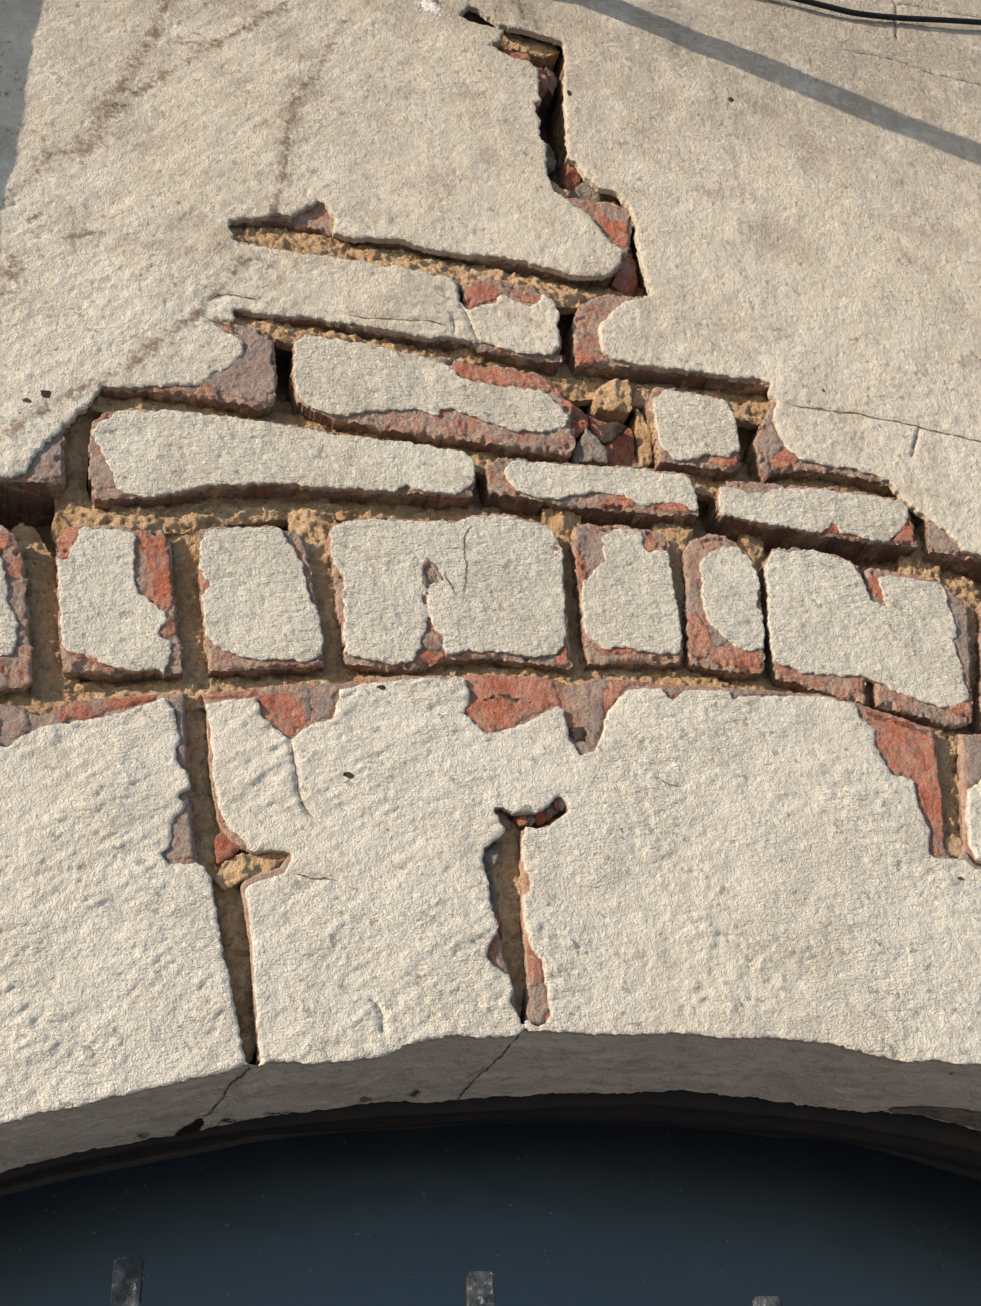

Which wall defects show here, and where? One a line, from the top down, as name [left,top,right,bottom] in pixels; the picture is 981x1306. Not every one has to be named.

crack [205,294,260,324]
peeling [202,327,276,404]
crack [347,308,478,340]
peeling [140,534,177,639]
peeling [943,587,971,680]
peeling [61,695,188,768]
peeling [462,644,646,747]
peeling [851,677,946,858]
peeling [162,791,195,861]
crack [172,663,338,1117]
crack [457,797,566,1100]
peeling [527,938,550,1026]